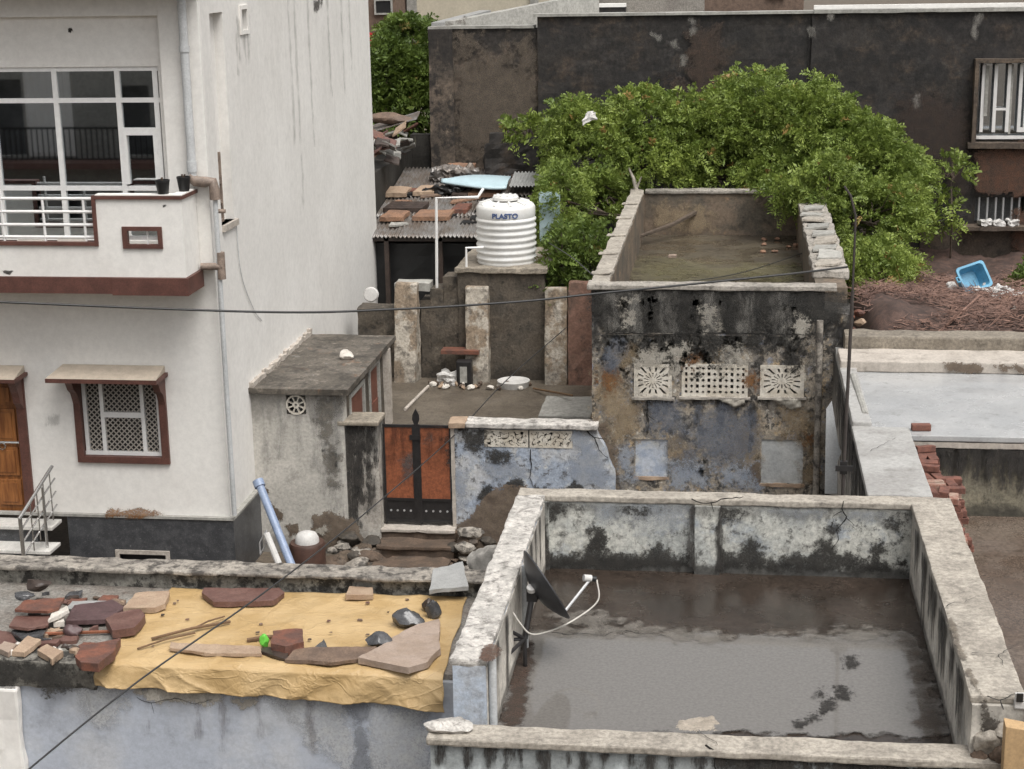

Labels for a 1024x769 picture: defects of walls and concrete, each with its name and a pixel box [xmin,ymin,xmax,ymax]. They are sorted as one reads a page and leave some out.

peeling [615,293,639,328]
peeling [697,304,722,335]
peeling [602,339,690,382]
water stain [313,395,382,528]
peeling [563,415,638,490]
peeling [649,400,686,446]
peeling [665,409,764,493]
spalling [775,305,854,495]
spalling [455,461,547,549]
crack [831,501,854,548]
water stain [715,507,962,732]